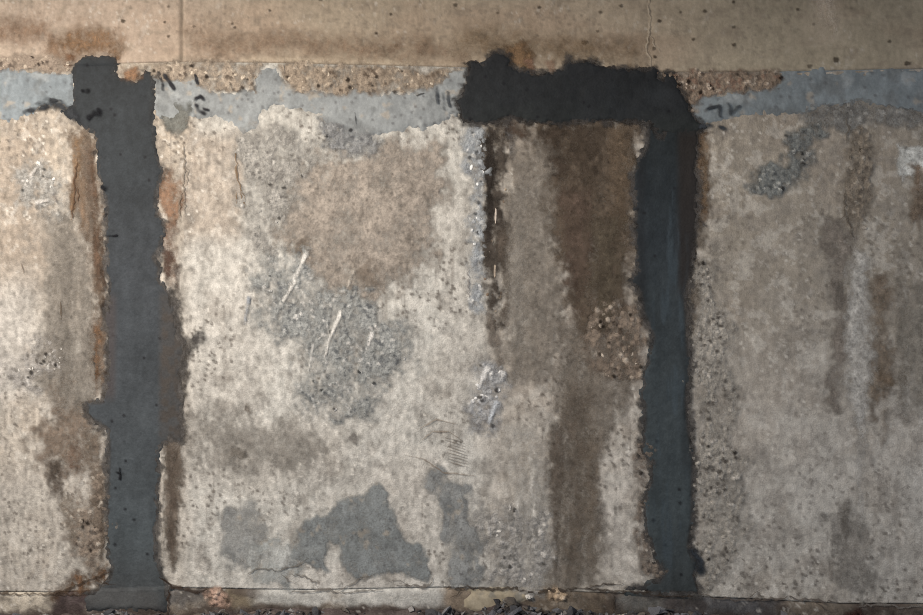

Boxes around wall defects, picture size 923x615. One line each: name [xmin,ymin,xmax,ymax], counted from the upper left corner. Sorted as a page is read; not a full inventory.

spalling [278,60,460,96]
spalling [657,68,783,112]
leakage [36,215,98,415]
leakage [478,120,642,597]
leakage [820,217,874,432]
crack [248,558,833,614]